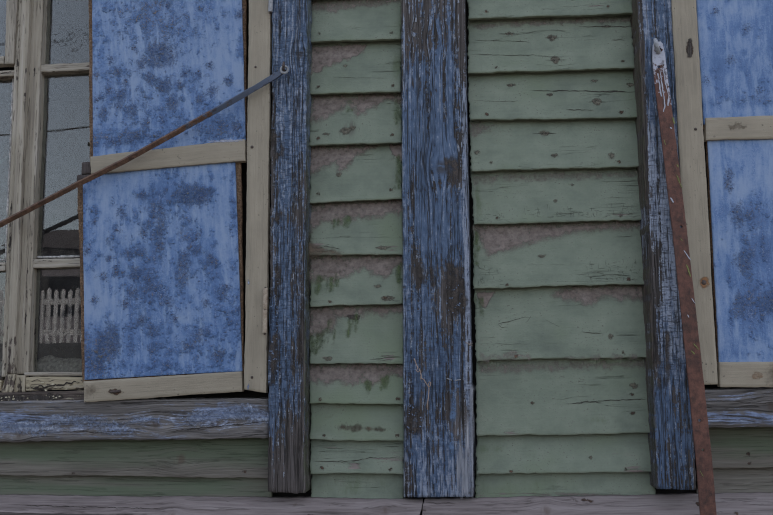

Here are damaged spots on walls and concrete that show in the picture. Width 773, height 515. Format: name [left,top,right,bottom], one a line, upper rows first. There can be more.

peeling [311,44,366,75]
peeling [311,93,401,121]
peeling [310,199,402,228]
peeling [310,255,402,292]
peeling [444,261,468,316]
peeling [268,256,281,394]
peeling [290,305,403,371]
peeling [310,363,403,391]
peeling [0,393,63,401]